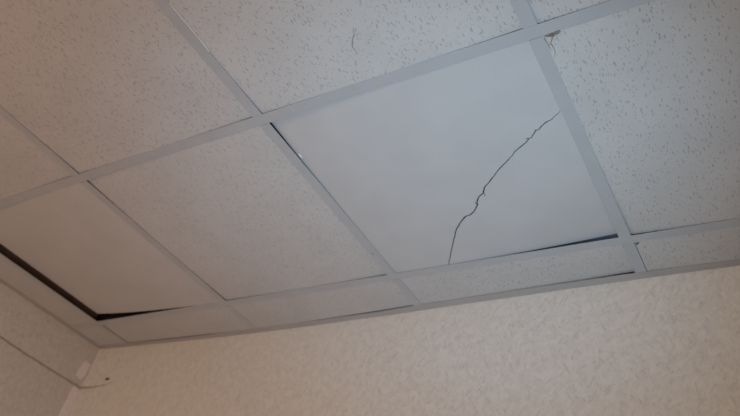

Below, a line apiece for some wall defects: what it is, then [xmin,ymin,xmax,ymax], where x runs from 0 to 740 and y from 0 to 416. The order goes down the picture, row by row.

crack [449,114,557,261]